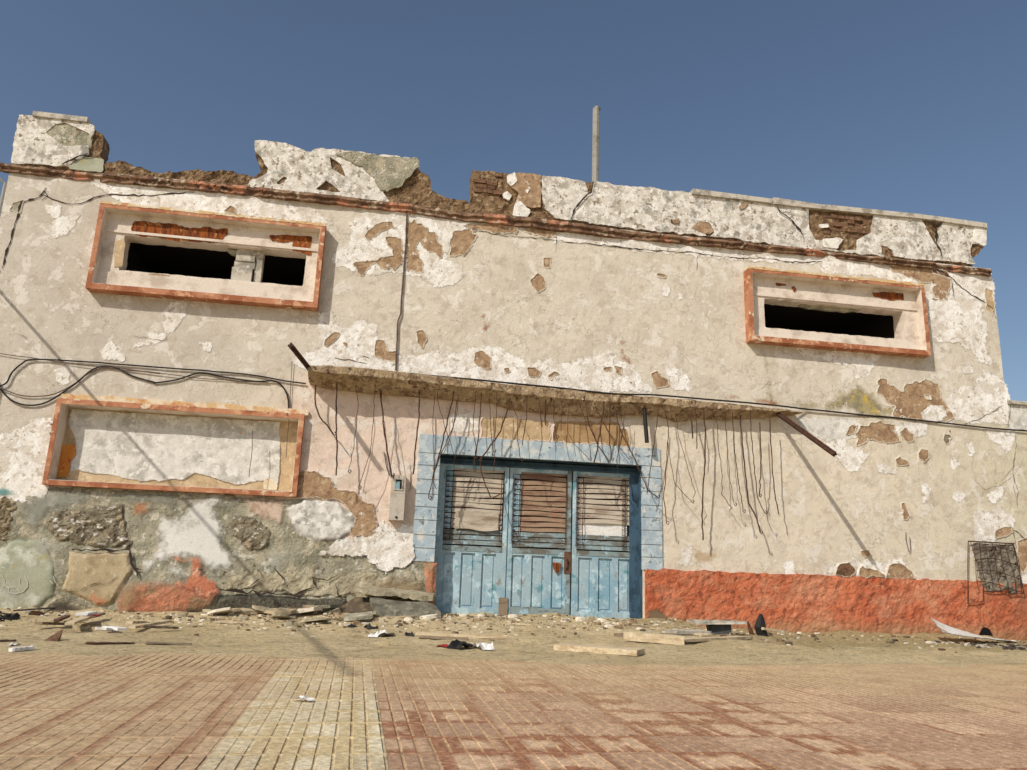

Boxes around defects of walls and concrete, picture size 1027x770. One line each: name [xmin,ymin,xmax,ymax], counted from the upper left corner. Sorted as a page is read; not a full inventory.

peeling [114,239,125,267]
peeling [92,182,334,230]
crack [925,220,996,317]
peeling [99,300,188,362]
peeling [332,171,1016,474]
peeling [291,310,779,540]
peeling [45,366,637,629]
peeling [827,549,916,579]